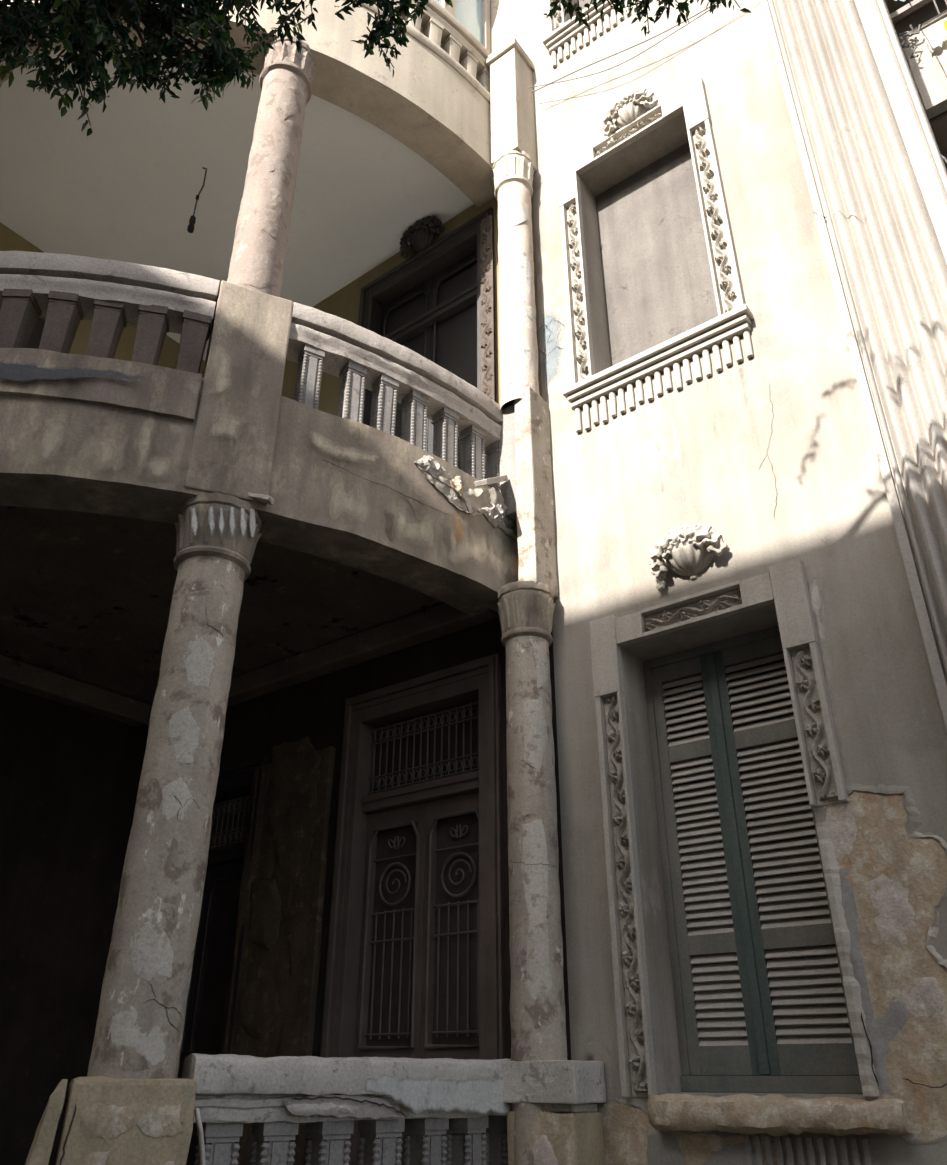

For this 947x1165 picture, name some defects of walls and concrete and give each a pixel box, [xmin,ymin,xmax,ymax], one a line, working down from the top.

peeling [183,585,234,687]
peeling [169,706,200,764]
peeling [162,778,193,821]
peeling [130,921,174,981]
peeling [815,783,947,1146]
crack [144,983,183,1032]
peeling [107,1005,168,1072]
crack [59,1104,76,1165]
peeling [597,1097,778,1165]